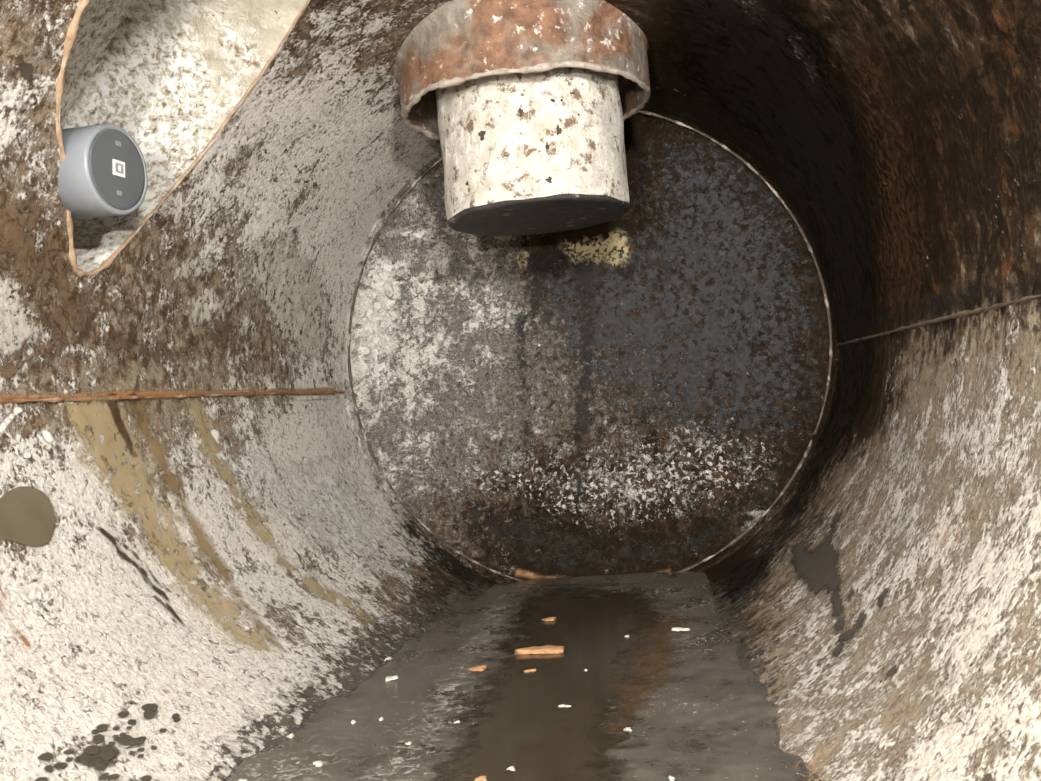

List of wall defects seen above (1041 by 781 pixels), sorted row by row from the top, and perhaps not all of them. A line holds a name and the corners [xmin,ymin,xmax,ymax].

peeling [0,277,43,356]
corrosion [0,388,336,456]
peeling [0,486,56,547]
damp [60,397,278,651]
crack [97,527,185,627]
damp [181,397,515,781]
peeling [788,512,867,658]
spalling [35,704,181,781]